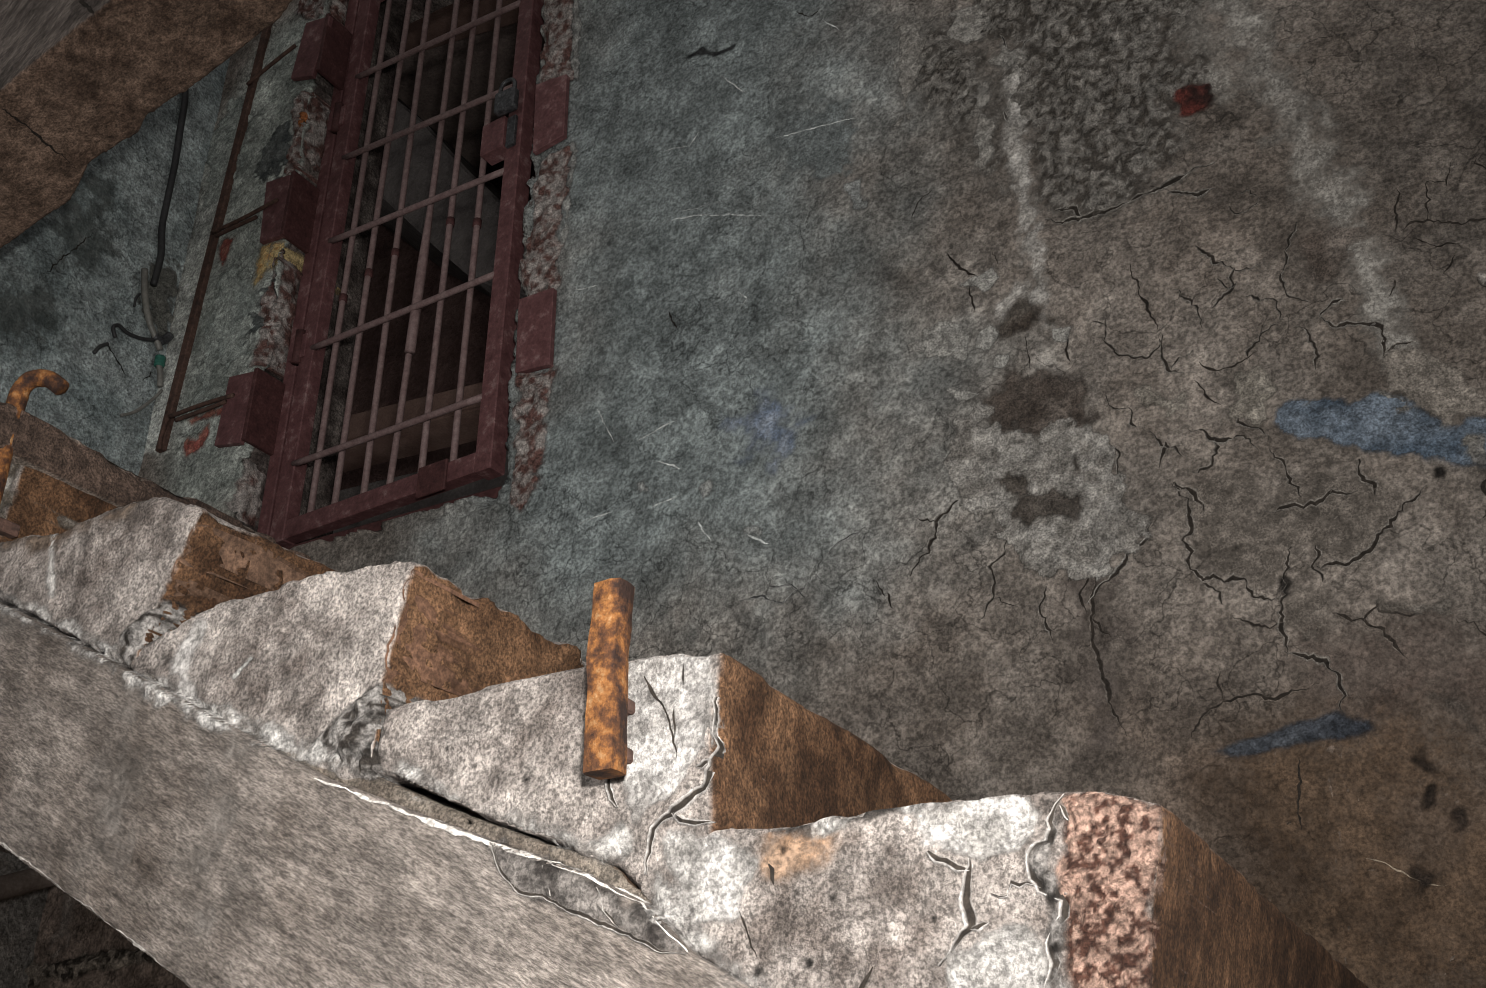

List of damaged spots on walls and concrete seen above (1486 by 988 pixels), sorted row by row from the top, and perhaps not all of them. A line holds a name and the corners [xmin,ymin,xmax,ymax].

flaking render [539,0,582,83]
flaking render [520,141,579,296]
crack [1045,161,1261,225]
crack [1394,156,1486,287]
flaking render [510,365,558,511]
crack [979,222,1486,737]
crack [876,500,958,609]
crack [643,663,729,875]
peeling [1221,712,1372,756]
flaking render [663,831,757,923]
spalling [777,791,1176,988]
crack [926,794,1070,988]